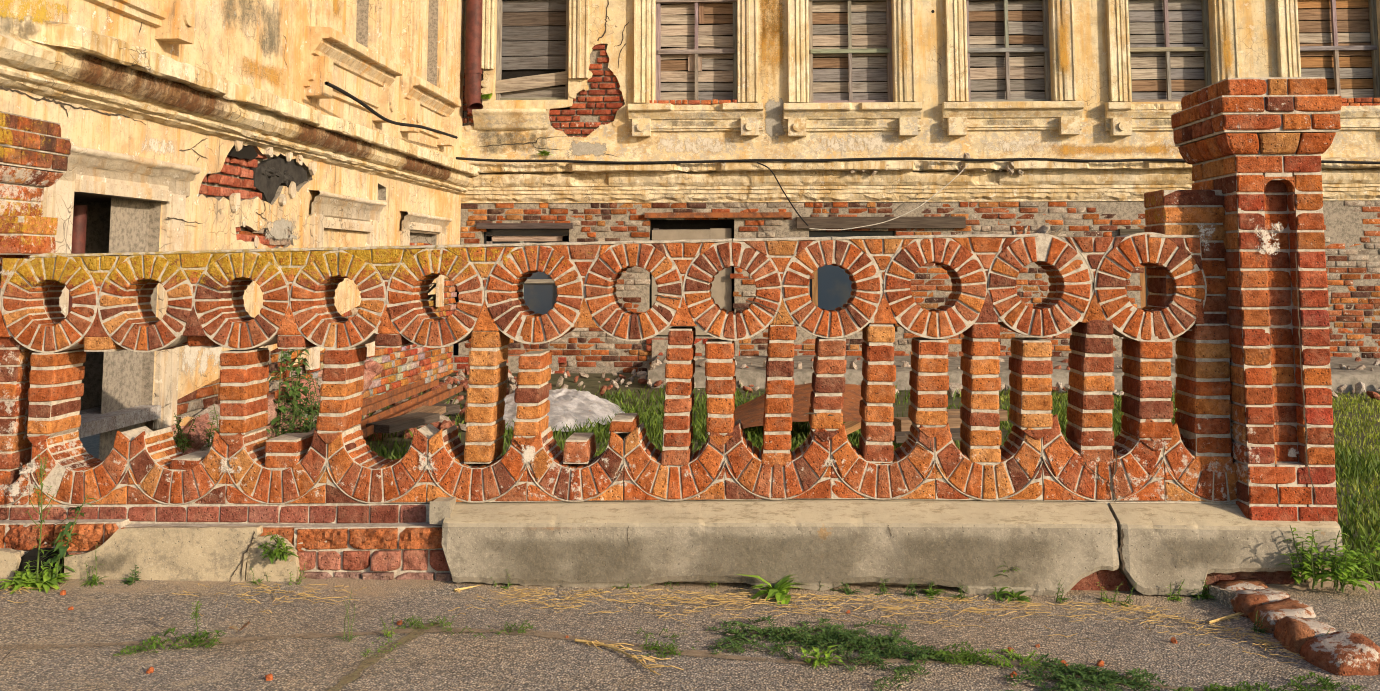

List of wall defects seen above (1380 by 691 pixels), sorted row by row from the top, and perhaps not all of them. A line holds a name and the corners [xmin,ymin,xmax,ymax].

crack [594,0,629,68]
flaking render [549,37,630,157]
flaking render [199,140,317,249]
crack [1084,449,1125,571]